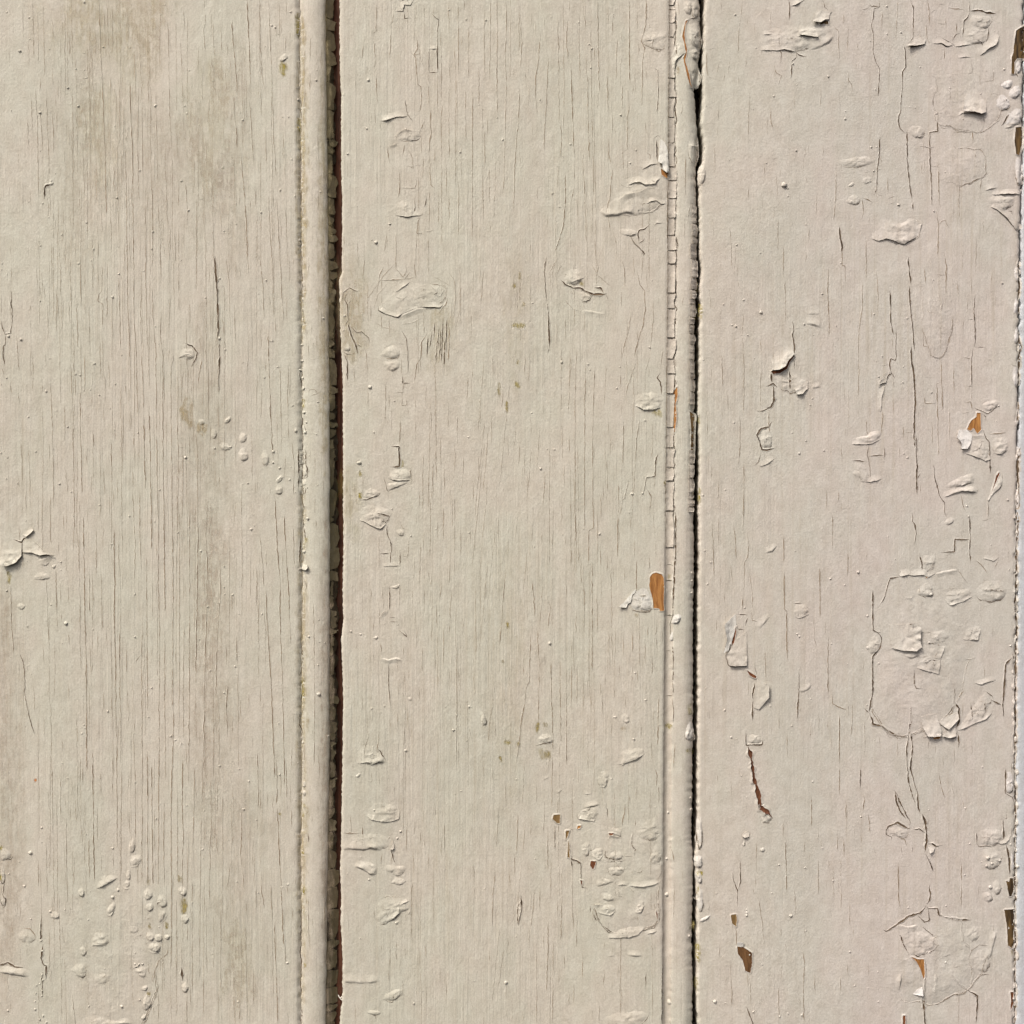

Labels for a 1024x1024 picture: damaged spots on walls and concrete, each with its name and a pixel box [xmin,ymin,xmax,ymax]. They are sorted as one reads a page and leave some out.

peeling [758,0,834,77]
peeling [600,135,669,217]
crack [705,5,822,325]
peeling [933,258,1023,534]
peeling [0,528,54,566]
crack [0,0,771,1024]
peeling [618,571,666,613]
peeling [864,553,1019,748]
peeling [551,800,664,957]
peeling [736,942,754,975]
crack [708,490,979,1024]
peeling [879,670,1019,1024]